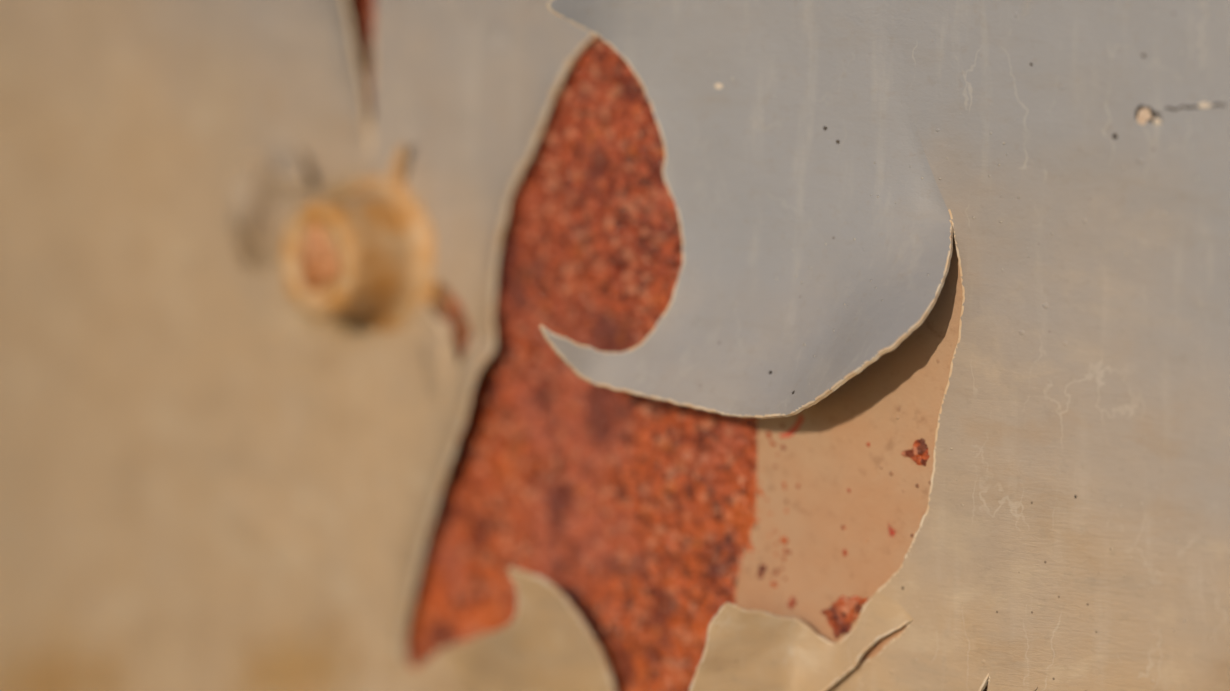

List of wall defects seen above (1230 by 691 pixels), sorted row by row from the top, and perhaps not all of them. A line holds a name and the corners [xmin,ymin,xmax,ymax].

corrosion [347,0,375,130]
crack [1135,99,1230,125]
corrosion [406,37,791,691]
peeling [368,0,954,691]
corrosion [901,438,930,466]
corrosion [821,596,869,640]